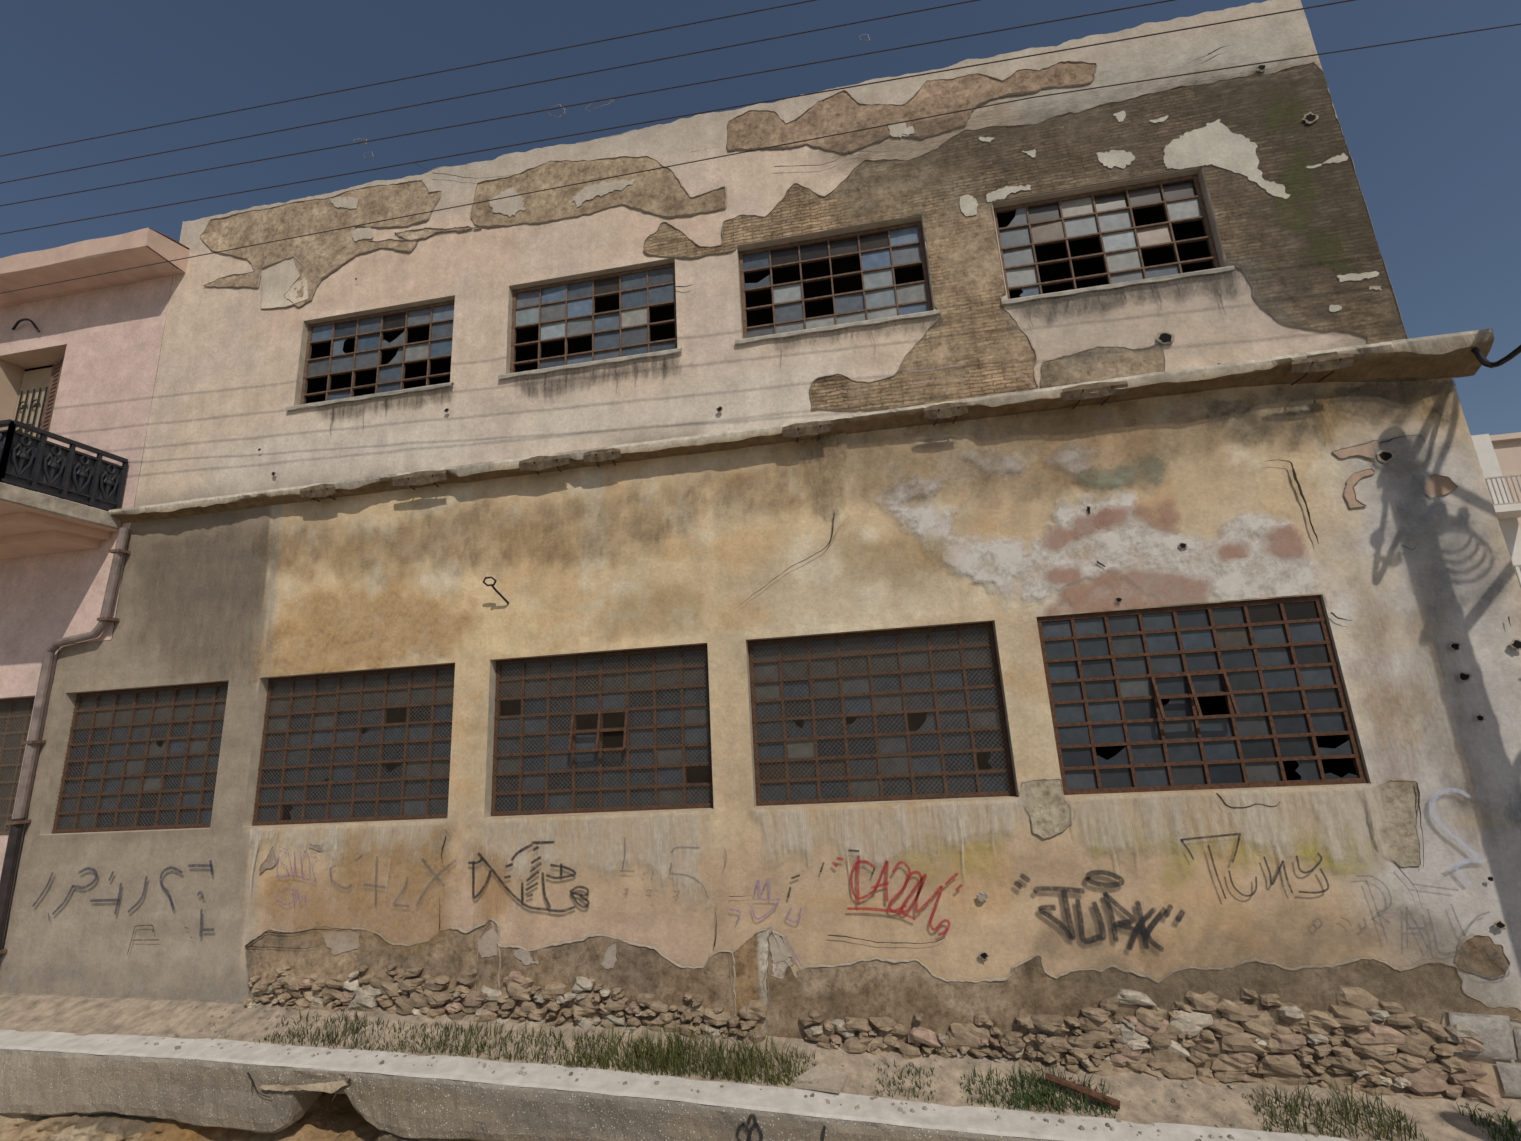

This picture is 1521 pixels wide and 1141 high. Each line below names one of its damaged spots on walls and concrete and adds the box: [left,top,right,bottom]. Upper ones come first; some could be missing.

flaking render [200,61,1409,443]
crack [1269,460,1319,544]
flaking render [1332,439,1395,509]
flaking render [259,846,278,875]
spalling [245,918,1521,1093]